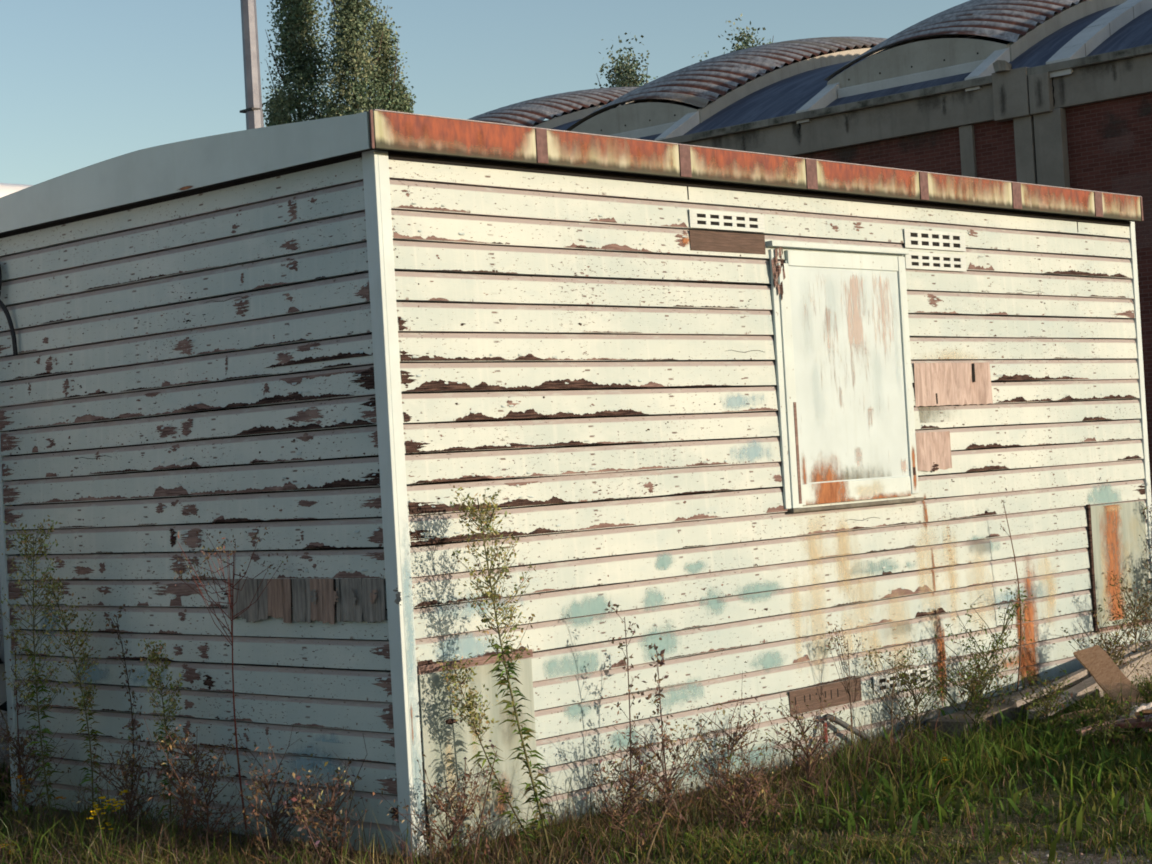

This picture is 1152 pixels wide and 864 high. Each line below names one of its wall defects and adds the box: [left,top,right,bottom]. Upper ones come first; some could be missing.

corrosion [380,111,533,156]
corrosion [551,131,673,163]
corrosion [692,147,803,176]
corrosion [819,161,916,190]
corrosion [1023,184,1138,209]
peeling [566,219,766,279]
peeling [901,352,1004,484]
peeling [408,459,731,545]
peeling [752,402,802,539]
corrosion [803,449,928,526]
peeling [0,313,384,757]
peeling [788,665,915,716]